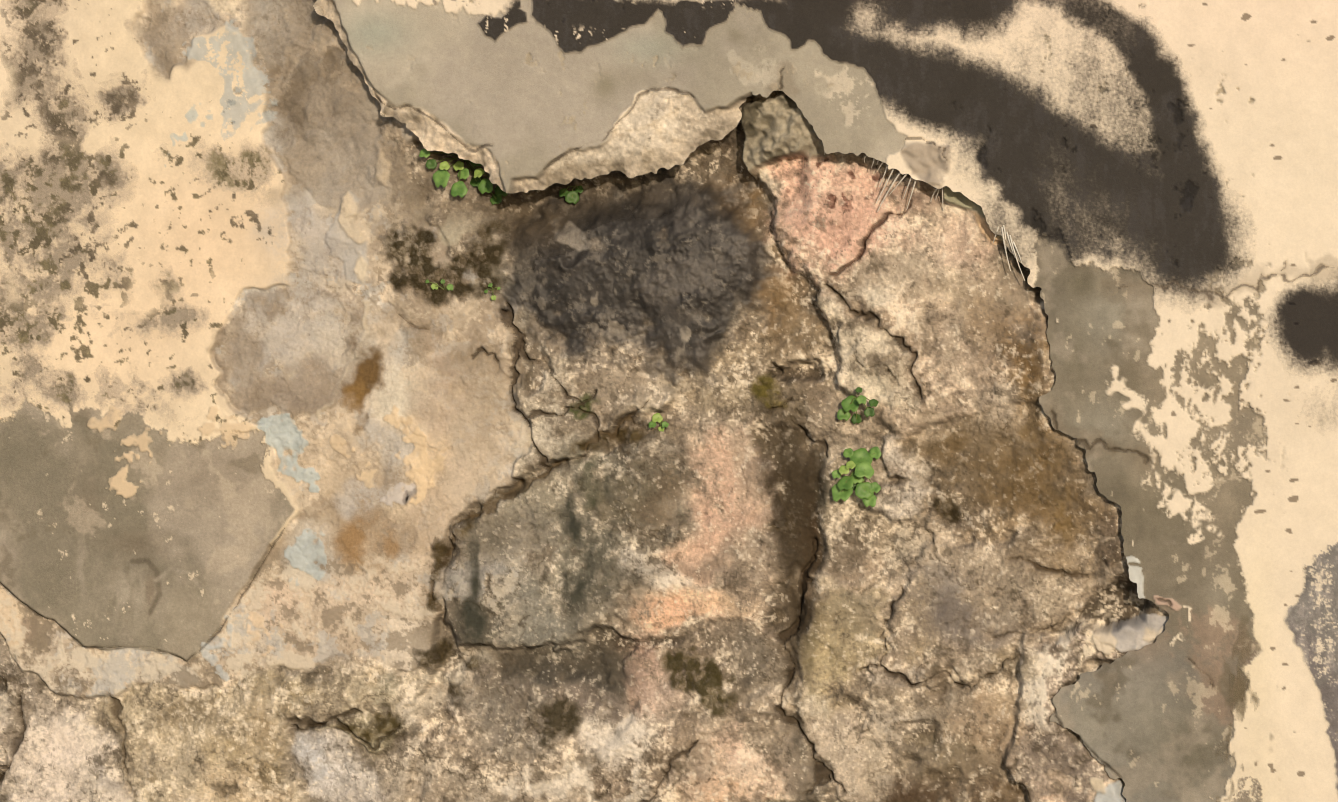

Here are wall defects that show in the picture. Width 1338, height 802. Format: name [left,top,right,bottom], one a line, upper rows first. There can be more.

peeling [133,0,909,198]
leakage [0,0,787,444]
crack [824,199,922,399]
leakage [466,475,497,519]
crack [429,303,660,612]
leakage [538,417,606,473]
spalling [0,152,1268,802]
crack [769,398,828,457]
crack [774,537,846,795]
crack [859,587,1058,689]
crack [1010,556,1089,579]
crack [639,740,699,802]